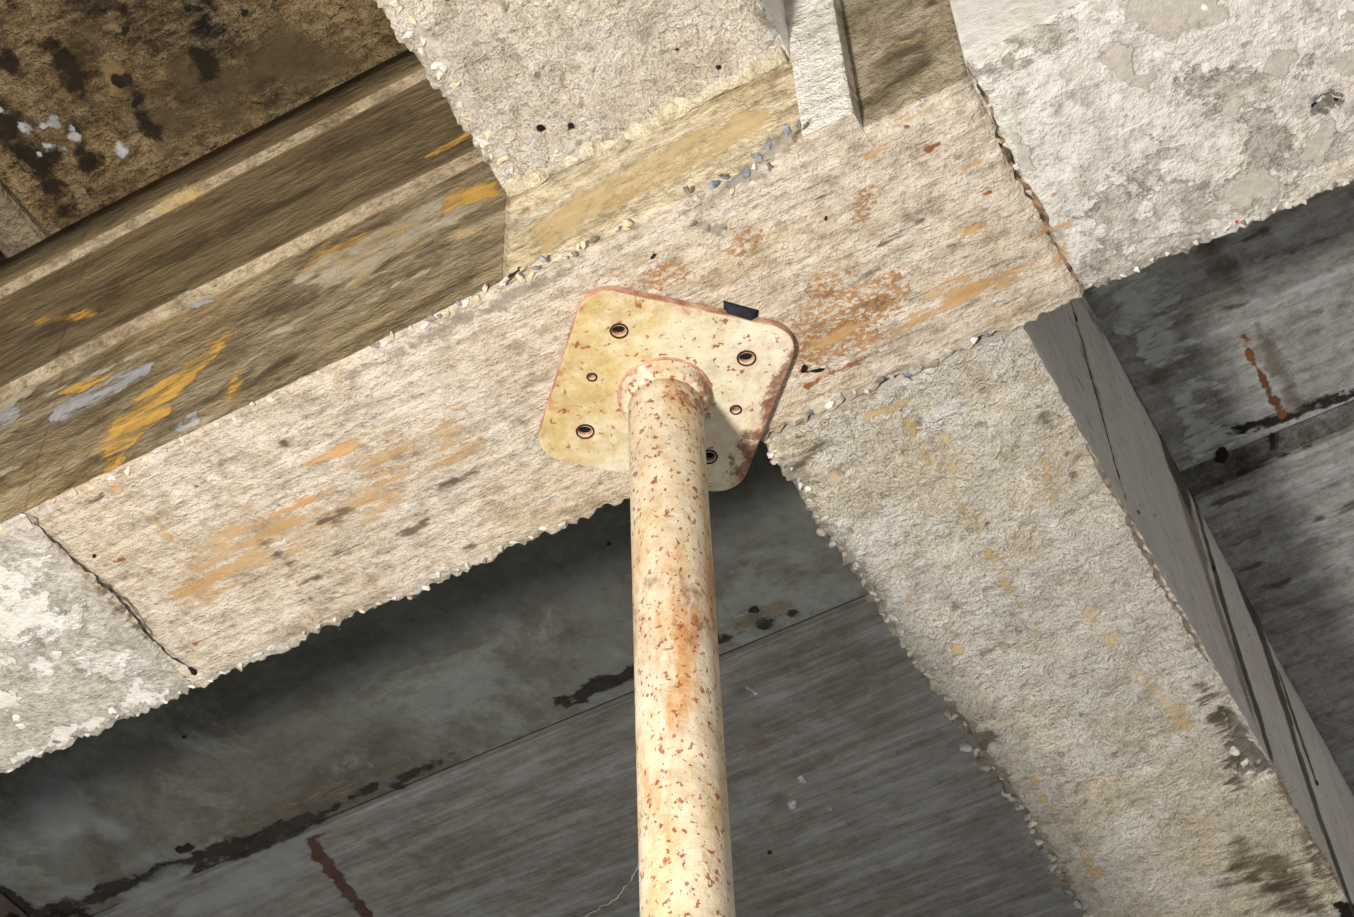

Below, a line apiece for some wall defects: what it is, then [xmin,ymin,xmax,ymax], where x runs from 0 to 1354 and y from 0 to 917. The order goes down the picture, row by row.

leakage [0,48,21,76]
peeling [1101,0,1229,90]
leakage [0,103,129,217]
leakage [441,181,500,213]
peeling [1088,165,1354,287]
peeling [1299,89,1344,166]
rust [788,261,1032,389]
crack [964,63,1208,662]
rust [1241,334,1296,420]
crack [19,512,198,676]
peeling [0,521,566,772]
rust [307,834,373,917]